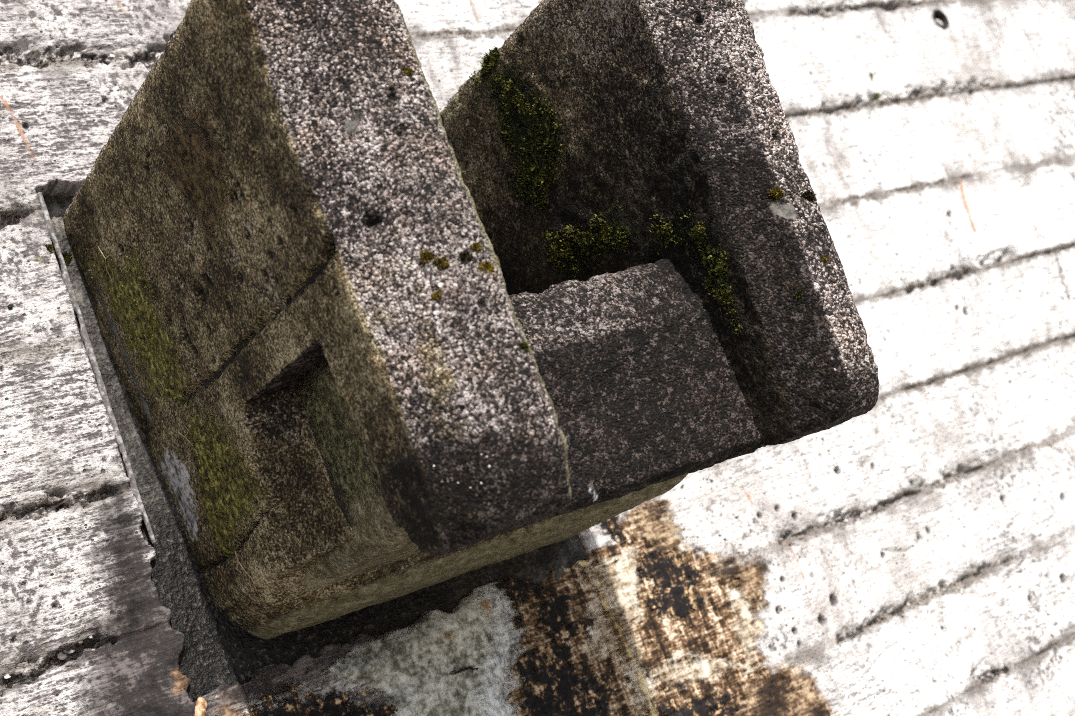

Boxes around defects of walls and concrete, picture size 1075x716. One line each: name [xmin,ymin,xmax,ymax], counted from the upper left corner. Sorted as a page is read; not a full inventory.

leakage [160,449,198,540]
corrosion [494,496,837,716]